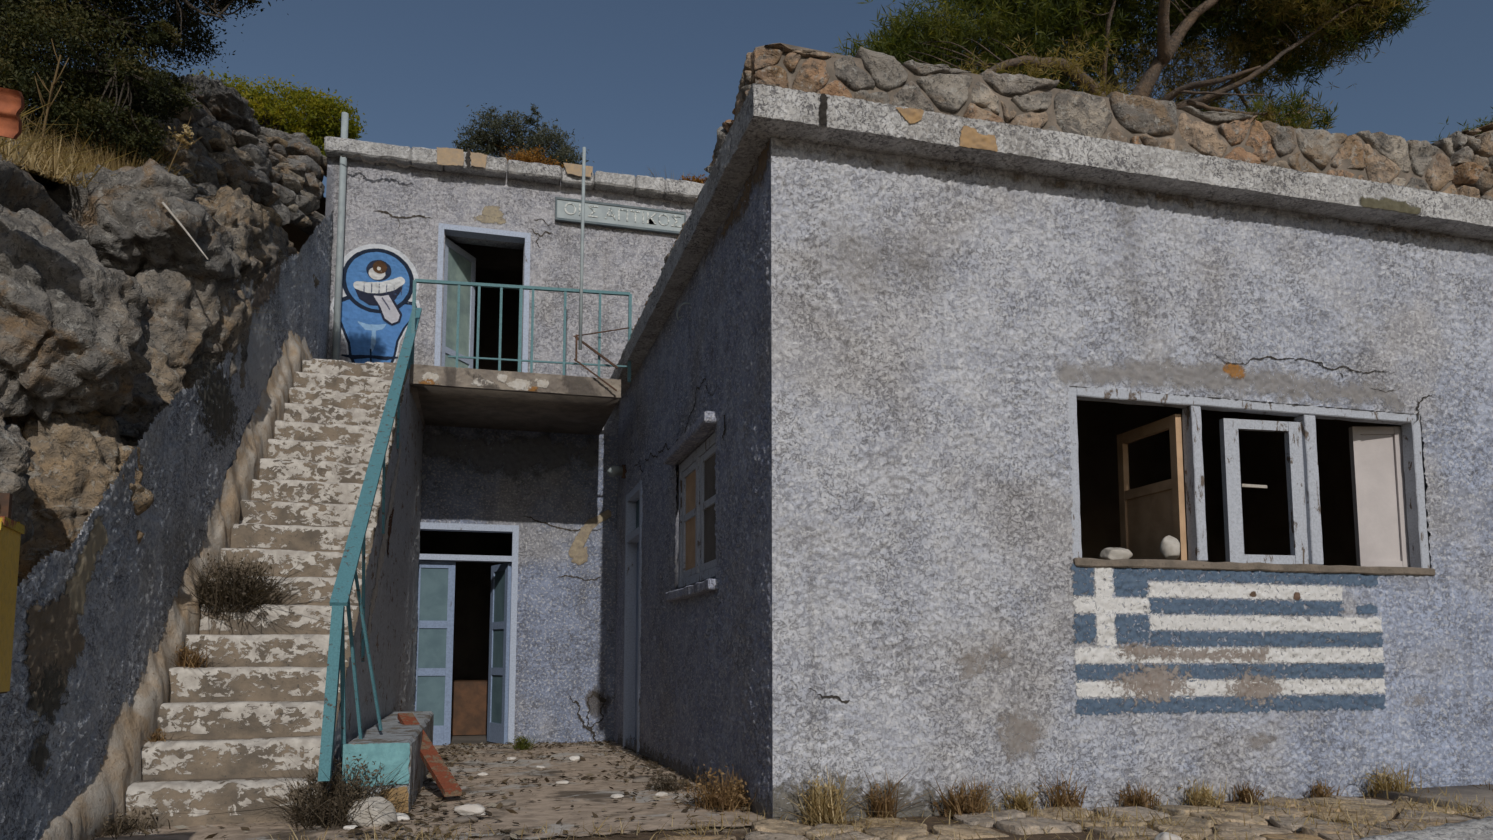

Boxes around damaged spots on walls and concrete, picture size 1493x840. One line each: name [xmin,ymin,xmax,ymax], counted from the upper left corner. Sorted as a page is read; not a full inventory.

crack [1215,354,1433,422]
flaking render [568,509,611,565]
peeling [125,358,410,817]
peeling [1097,642,1295,707]